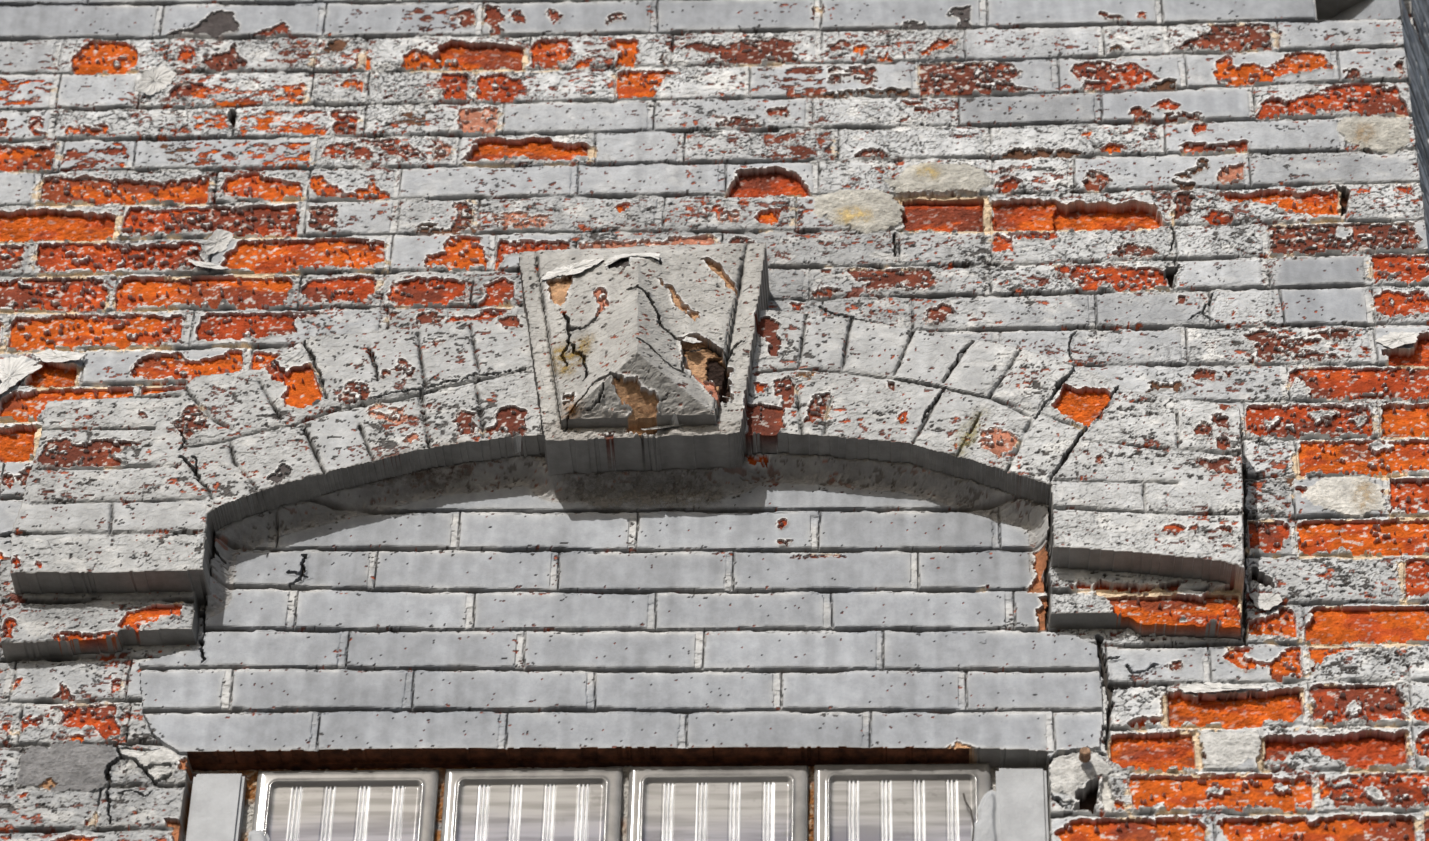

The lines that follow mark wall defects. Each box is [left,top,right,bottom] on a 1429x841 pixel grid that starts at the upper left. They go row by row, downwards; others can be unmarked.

peeling [1173,19,1411,119]
peeling [0,4,1035,489]
crack [305,340,526,404]
crack [563,311,620,431]
crack [627,284,745,374]
crack [894,340,989,423]
peeling [893,44,1429,841]
crack [1241,419,1249,646]
peeling [54,601,185,657]
peeling [0,678,125,743]
crack [1046,634,1159,808]
peeling [6,811,100,841]